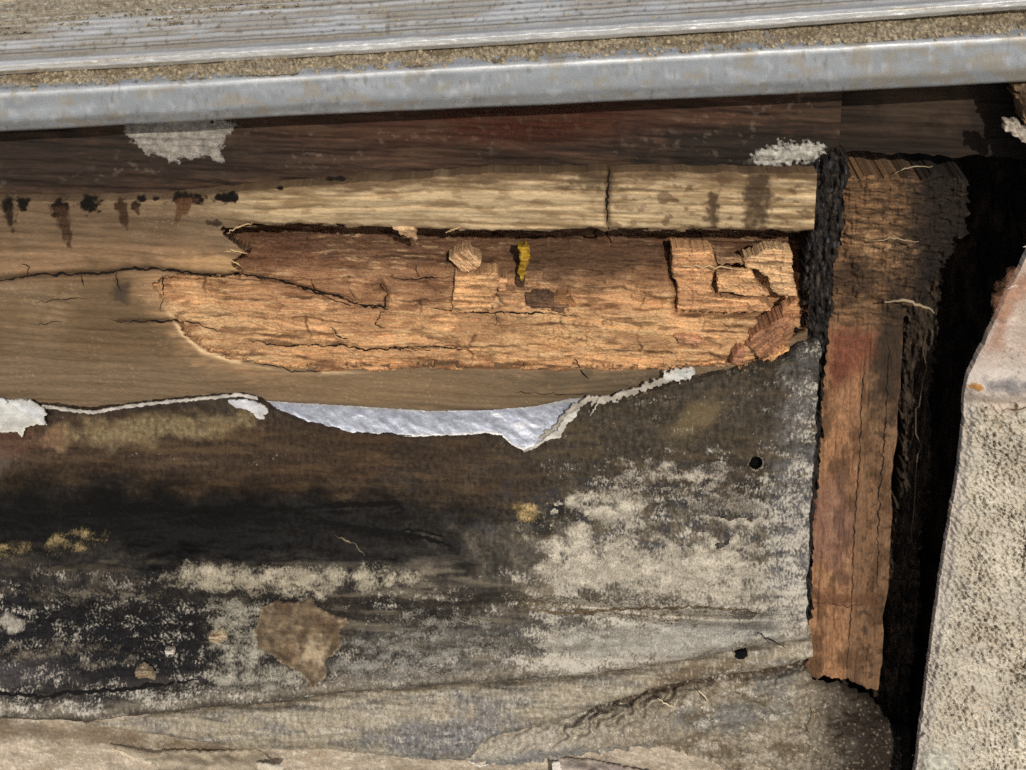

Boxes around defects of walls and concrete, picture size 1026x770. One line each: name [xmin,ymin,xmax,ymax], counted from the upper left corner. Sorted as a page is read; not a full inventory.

water stain [2,195,30,232]
water stain [51,194,159,247]
water stain [173,191,238,222]
crack [0,264,469,373]
crack [434,308,576,320]
peeling [41,392,268,419]
peeling [521,366,696,452]
water stain [512,461,782,661]
water stain [0,612,108,669]
peeling [252,597,347,687]
water stain [180,562,420,696]
water stain [328,609,491,682]